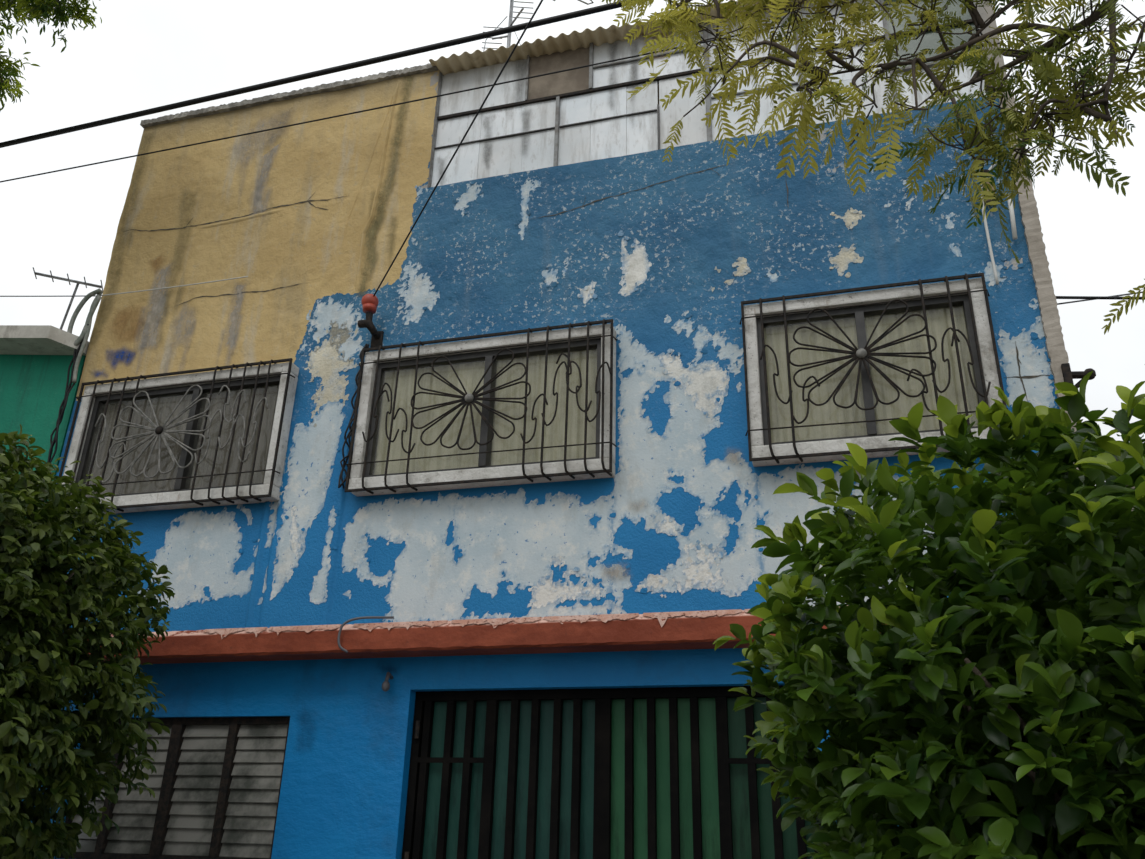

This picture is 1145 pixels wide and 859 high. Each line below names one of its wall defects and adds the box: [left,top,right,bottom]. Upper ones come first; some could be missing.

peeling [830,208,865,230]
peeling [577,282,598,304]
peeling [602,230,652,297]
peeling [829,244,864,278]
peeling [997,298,1057,408]
peeling [137,296,897,640]